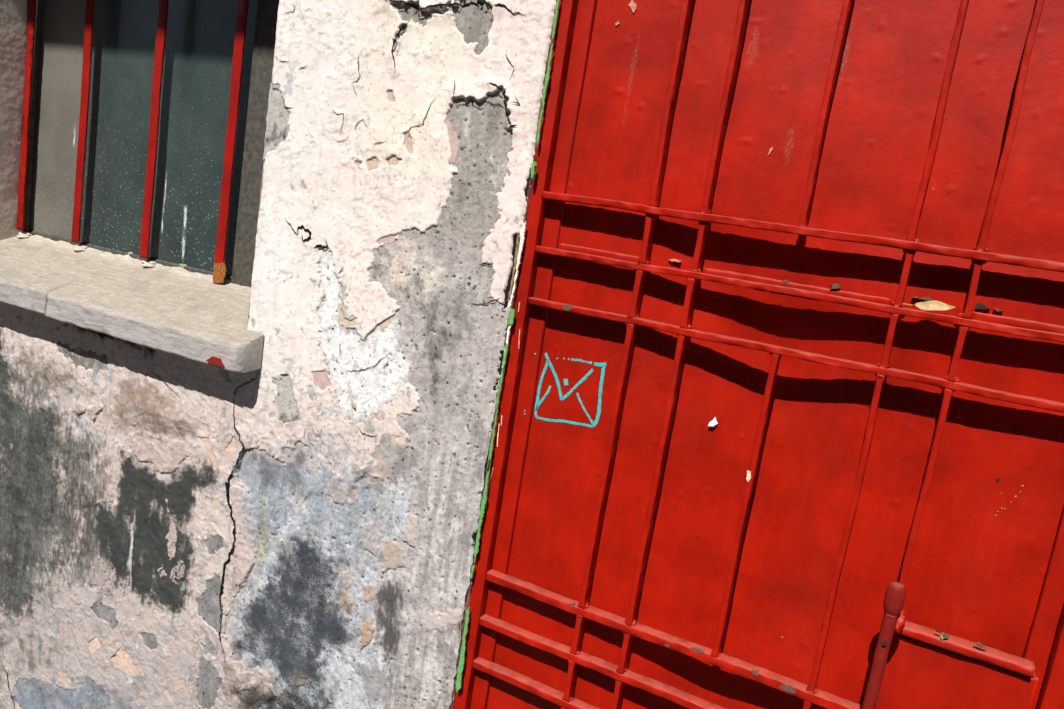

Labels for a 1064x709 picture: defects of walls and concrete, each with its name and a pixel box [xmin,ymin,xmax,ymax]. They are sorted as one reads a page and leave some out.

crack [332,55,520,145]
flaking render [394,0,493,55]
crack [386,0,527,67]
peeling [536,0,560,145]
leakage [62,323,157,356]
flaking render [195,82,515,709]
crack [218,372,288,660]
leakage [226,442,382,709]
peeling [141,633,158,650]